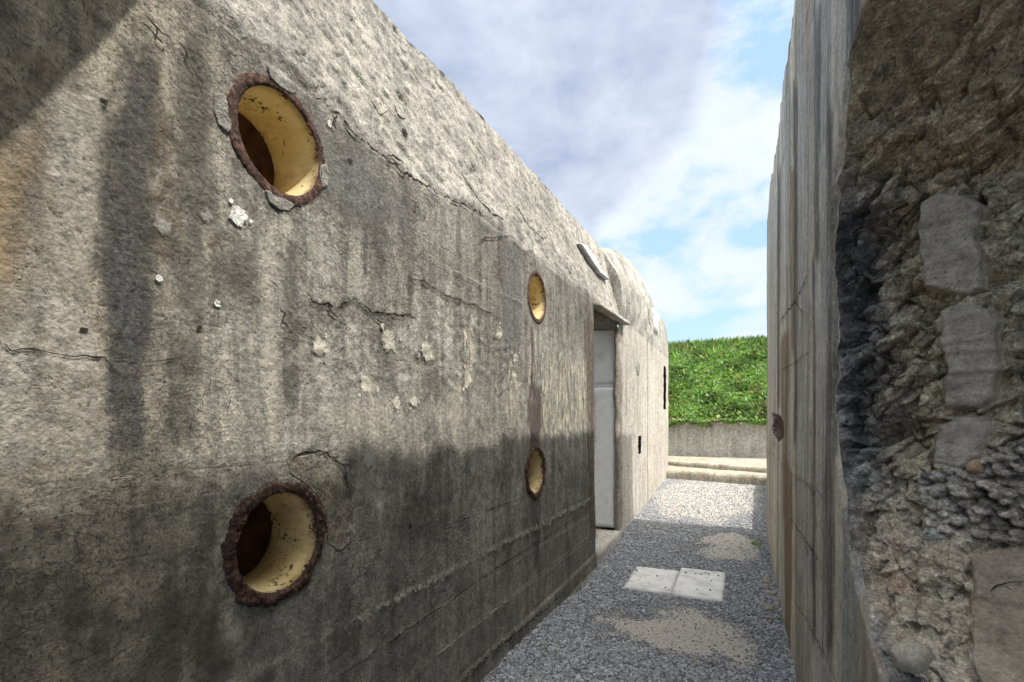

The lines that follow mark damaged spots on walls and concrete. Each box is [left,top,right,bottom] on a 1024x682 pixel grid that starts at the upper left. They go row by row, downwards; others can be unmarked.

crack [313,94,533,253]
damp [0,41,317,469]
crack [309,294,418,324]
crack [409,278,493,314]
crack [2,342,245,436]
damp [336,385,401,457]
damp [414,387,482,445]
crack [292,450,352,490]